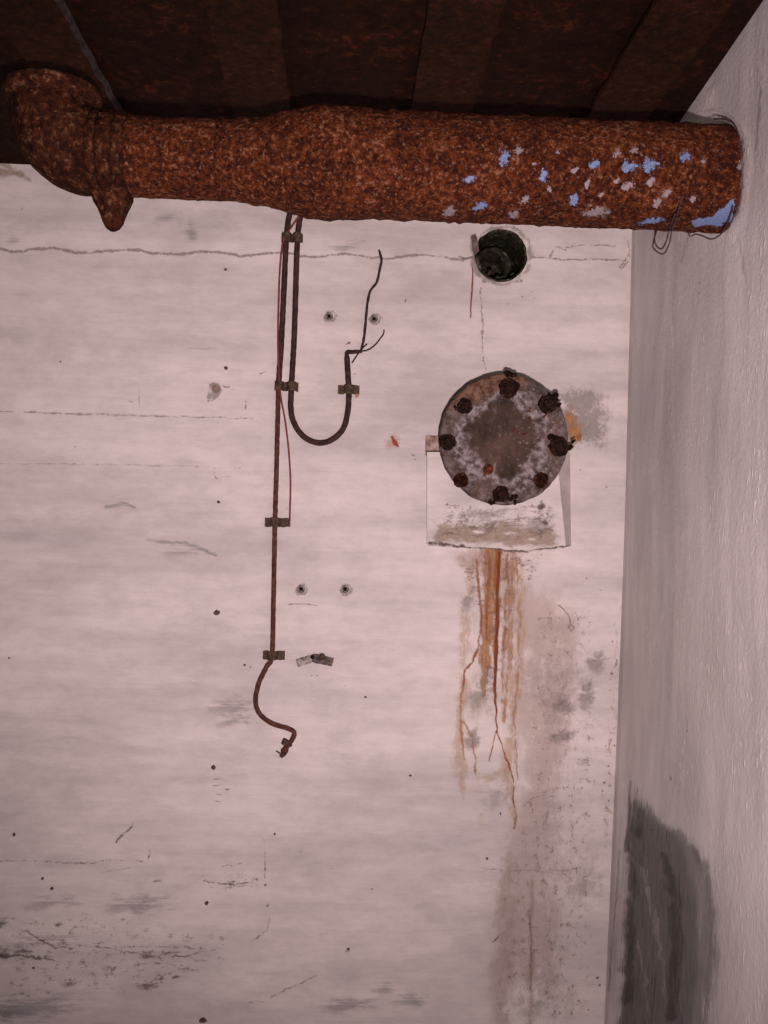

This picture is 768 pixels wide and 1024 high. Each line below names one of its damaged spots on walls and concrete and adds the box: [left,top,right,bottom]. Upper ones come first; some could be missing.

crack [0,247,474,261]
crack [531,243,629,268]
corrosion [460,548,521,828]
leakage [610,799,716,1024]